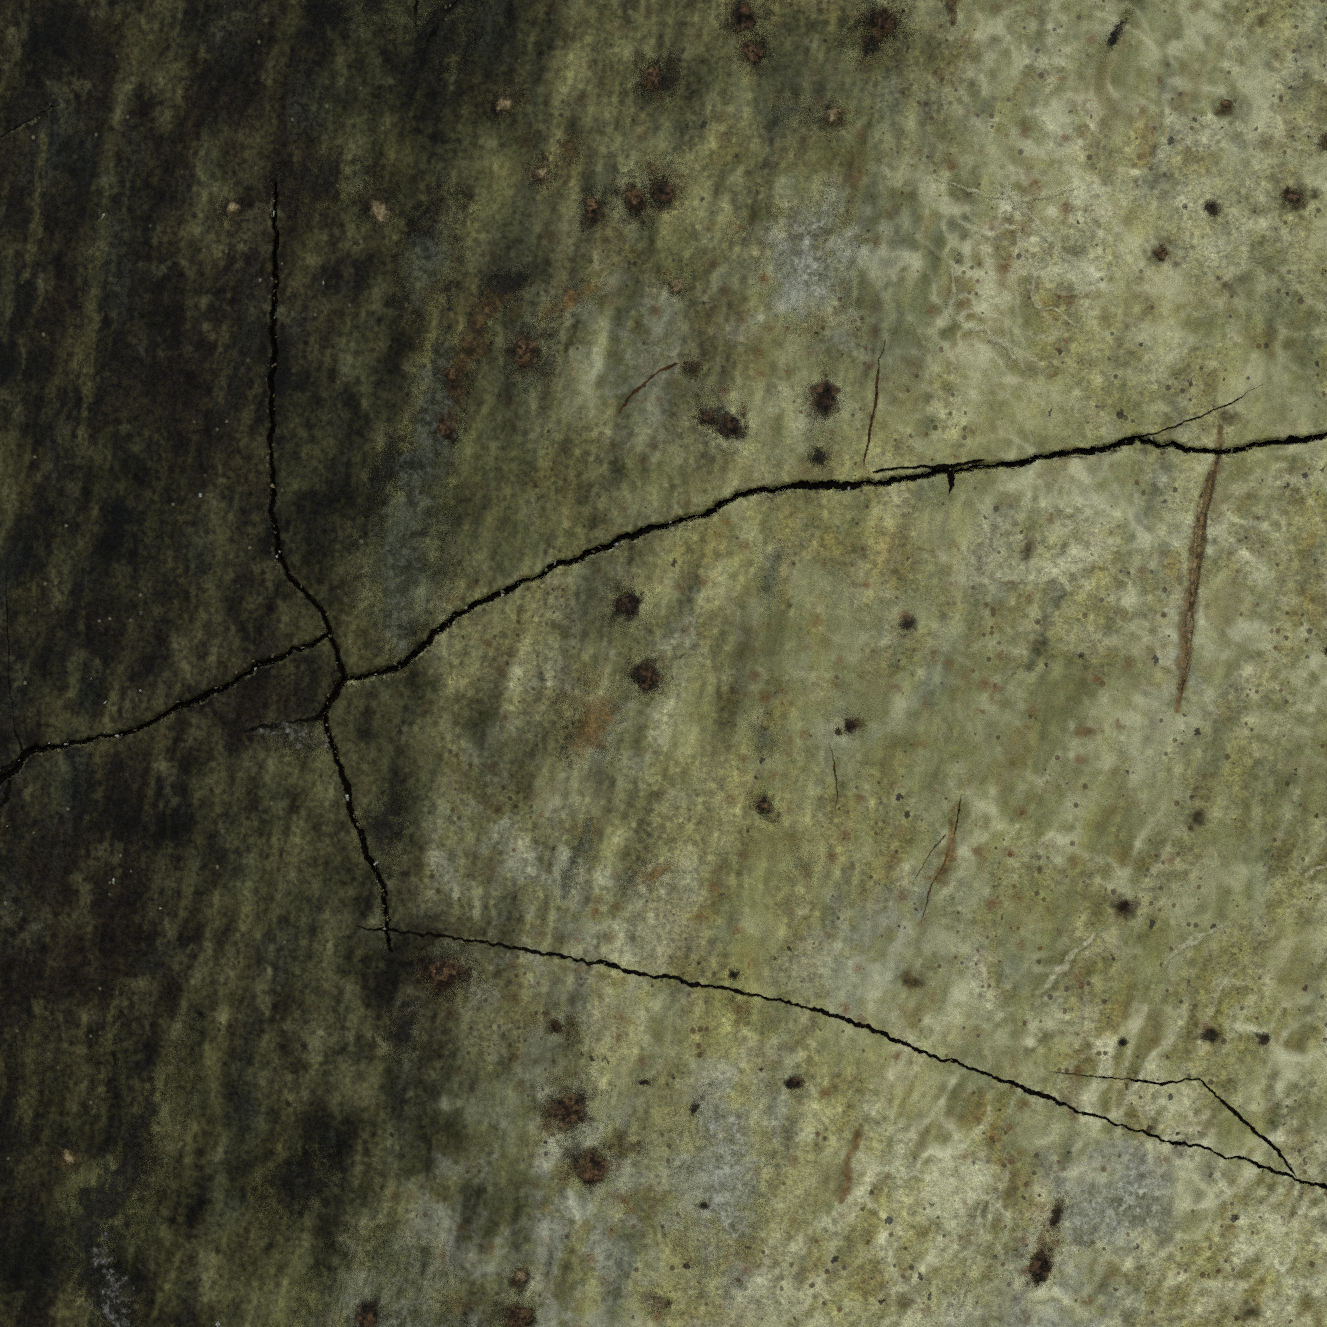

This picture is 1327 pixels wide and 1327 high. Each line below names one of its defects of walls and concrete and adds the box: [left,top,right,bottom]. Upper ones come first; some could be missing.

damp [757,13,847,133]
rust [615,165,677,224]
rust [1175,411,1234,712]
damp [0,0,720,1327]
rust [628,660,659,690]
crack [0,182,1327,1190]
rust [549,1093,592,1132]
rust [568,1136,636,1191]
rust [509,1268,530,1290]
rust [503,1305,536,1327]